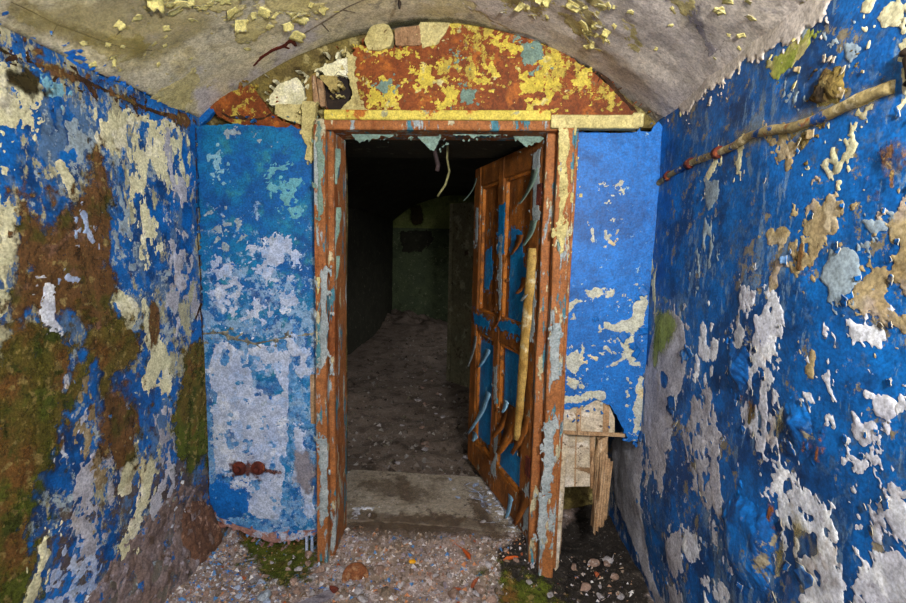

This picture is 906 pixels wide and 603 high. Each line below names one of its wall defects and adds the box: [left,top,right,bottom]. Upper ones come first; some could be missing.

water stain [0,299,146,603]
peeling [0,0,340,603]
corrosion [222,461,282,481]
peeling [317,0,906,603]
water stain [652,310,676,367]